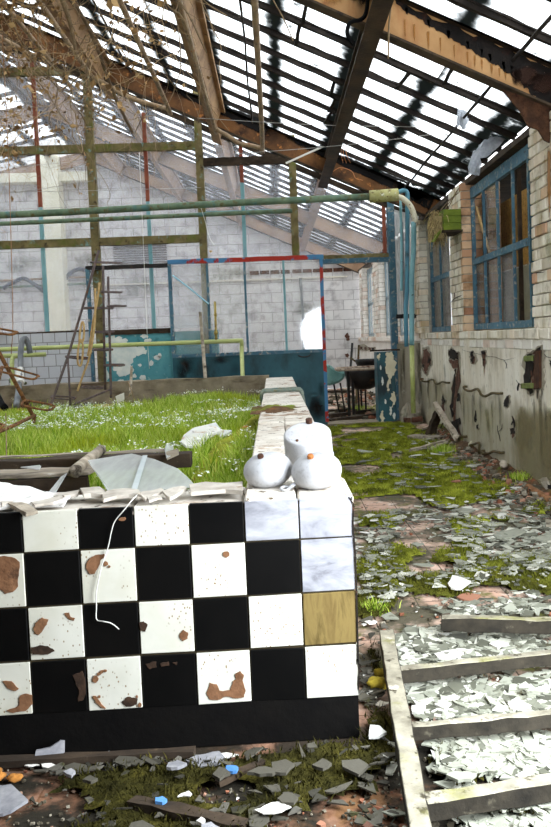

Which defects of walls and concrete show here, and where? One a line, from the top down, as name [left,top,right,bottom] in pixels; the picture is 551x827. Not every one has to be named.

peeling [105,334,162,382]
peeling [360,344,397,422]
flaking render [420,346,433,376]
flaking render [441,347,487,435]
flaking render [521,345,551,396]